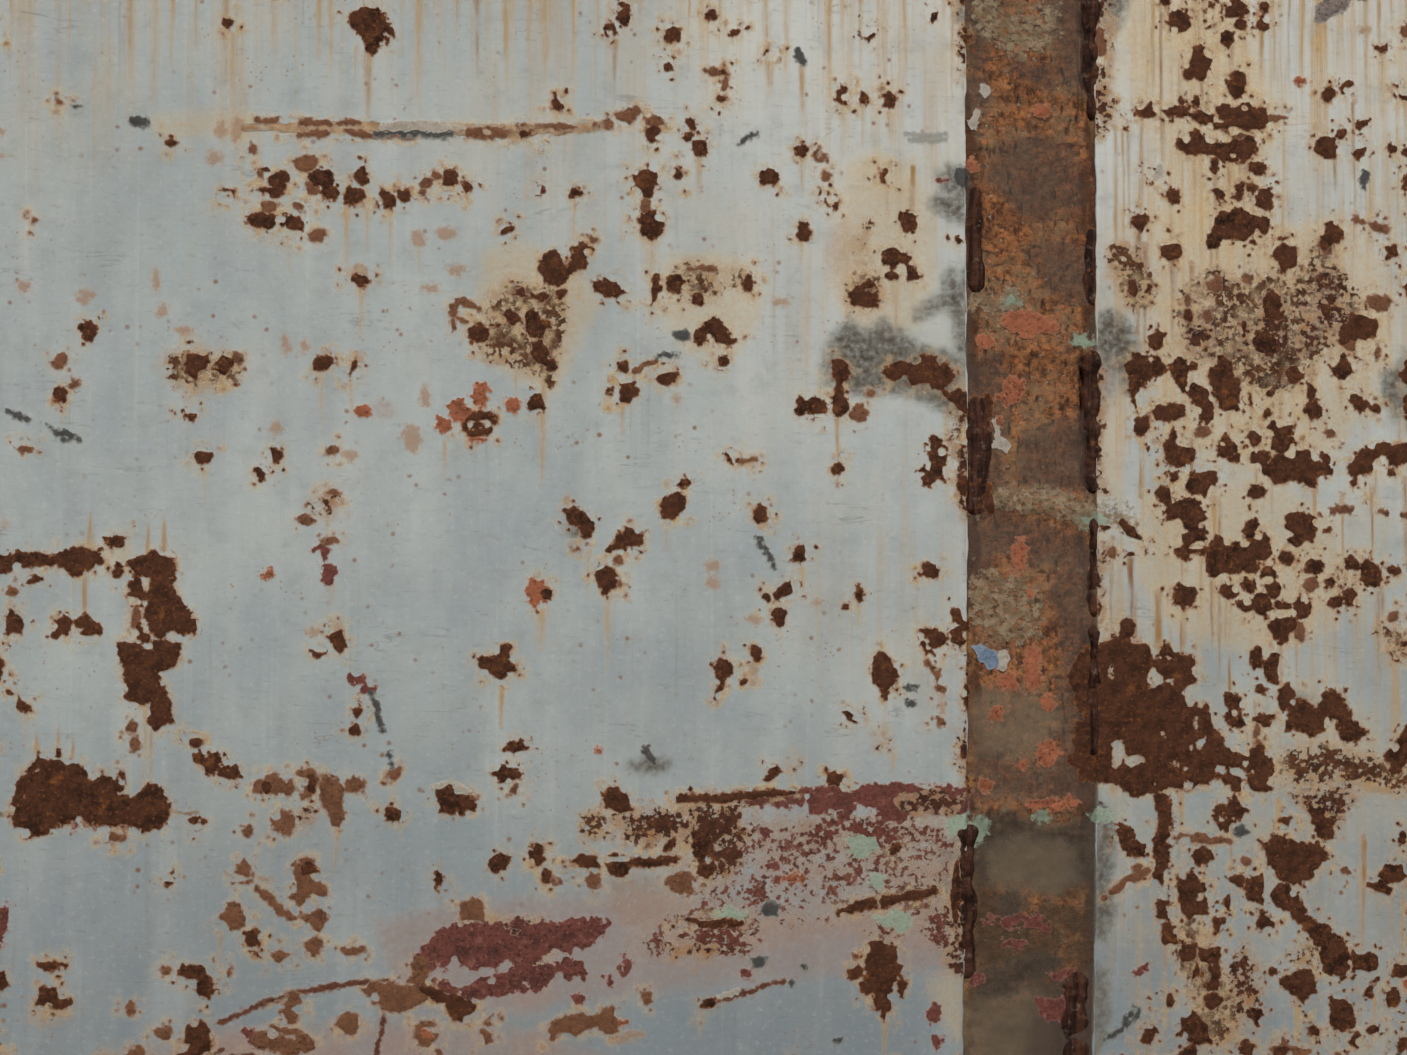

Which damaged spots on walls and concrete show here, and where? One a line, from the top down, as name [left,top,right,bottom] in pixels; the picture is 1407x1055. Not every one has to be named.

corrosion [318,0,396,98]
corrosion [593,0,633,70]
corrosion [653,19,690,81]
corrosion [214,118,483,250]
corrosion [404,104,786,452]
corrosion [787,219,813,243]
corrosion [792,0,1407,1055]
corrosion [748,536,819,632]
corrosion [472,642,525,717]
corrosion [0,521,408,1055]
corrosion [487,597,995,1050]
peeling [397,953,433,987]